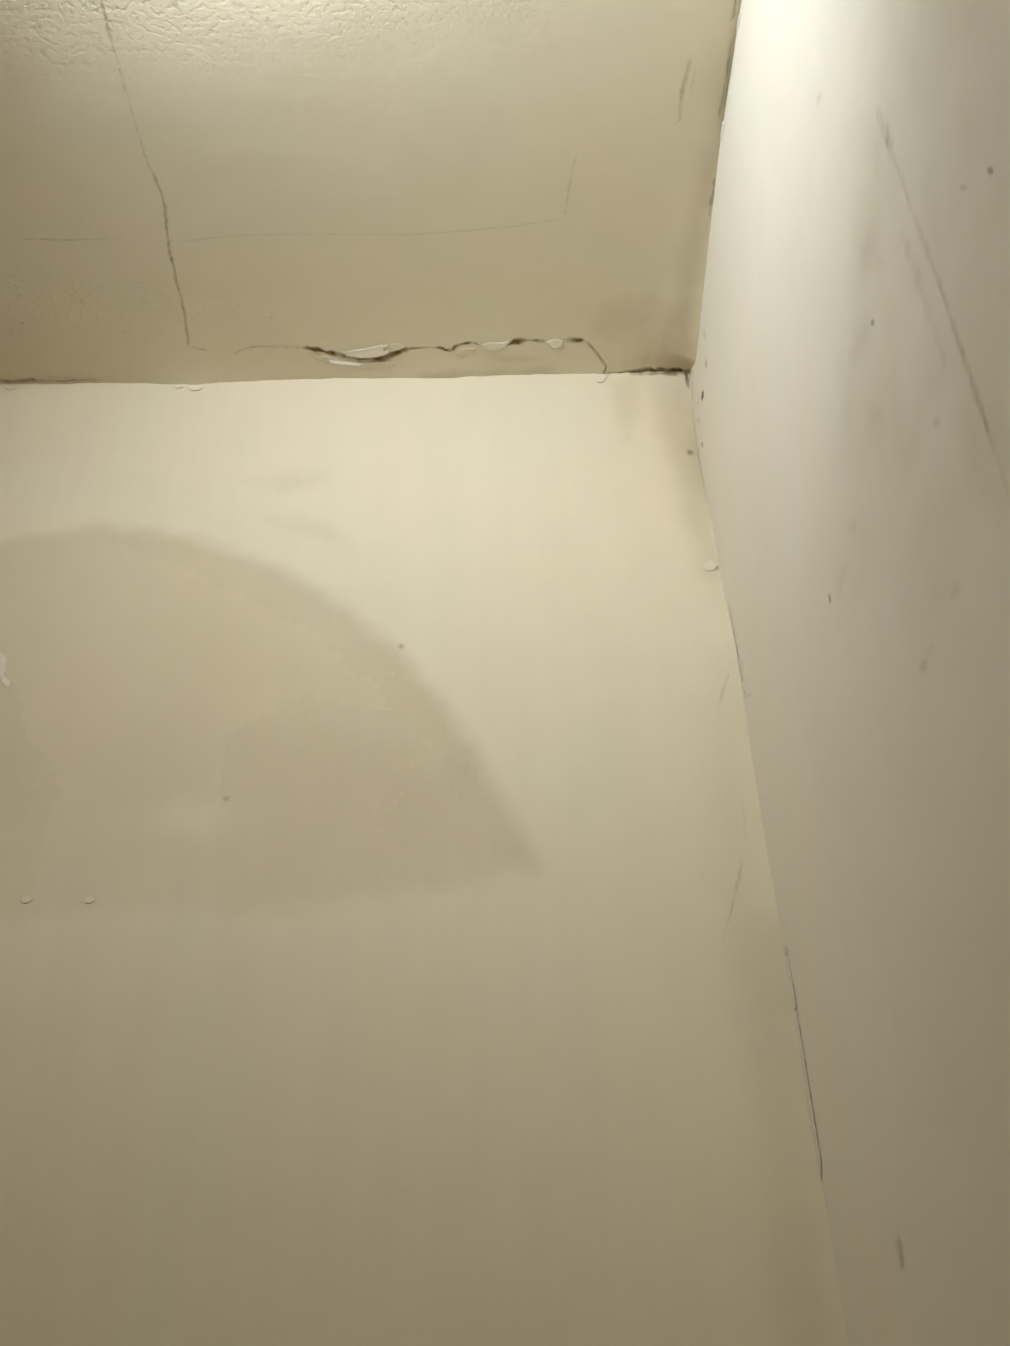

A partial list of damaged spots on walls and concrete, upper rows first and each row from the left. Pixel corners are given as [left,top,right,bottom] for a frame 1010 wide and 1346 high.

crack [305,343,405,370]
crack [437,339,583,357]
crack [596,368,699,404]